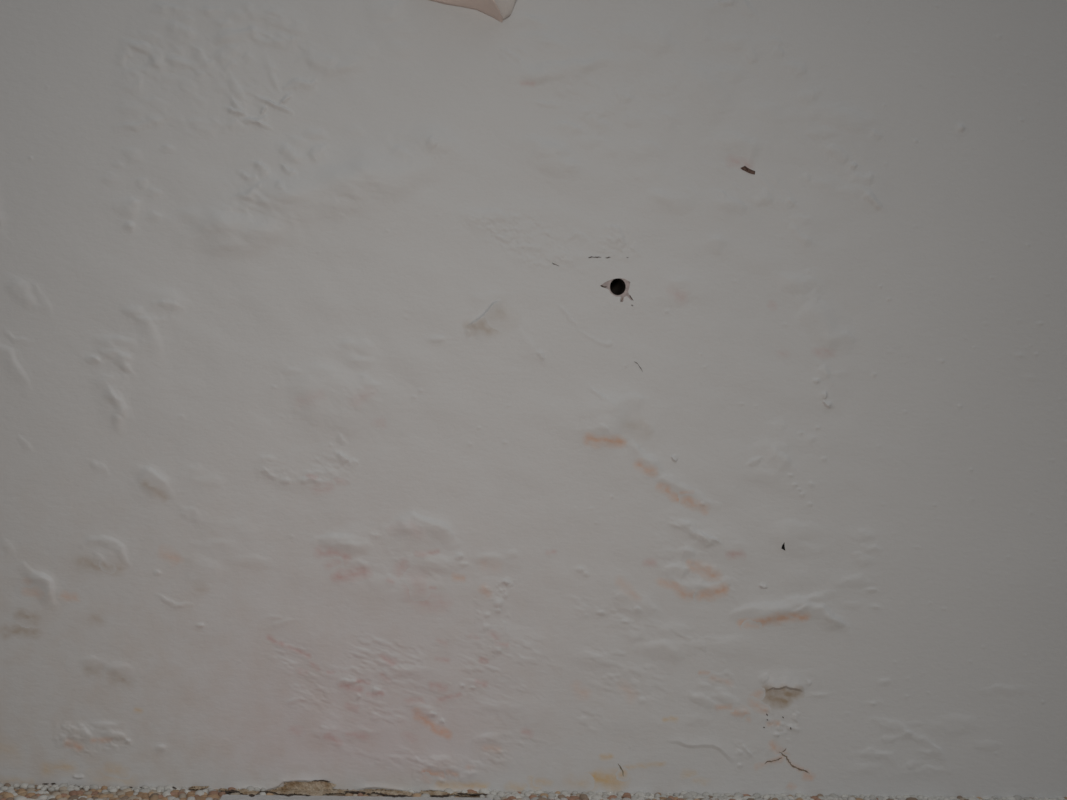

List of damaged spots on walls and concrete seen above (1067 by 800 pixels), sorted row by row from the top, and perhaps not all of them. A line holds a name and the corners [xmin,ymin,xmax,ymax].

peeling [189,771,490,797]